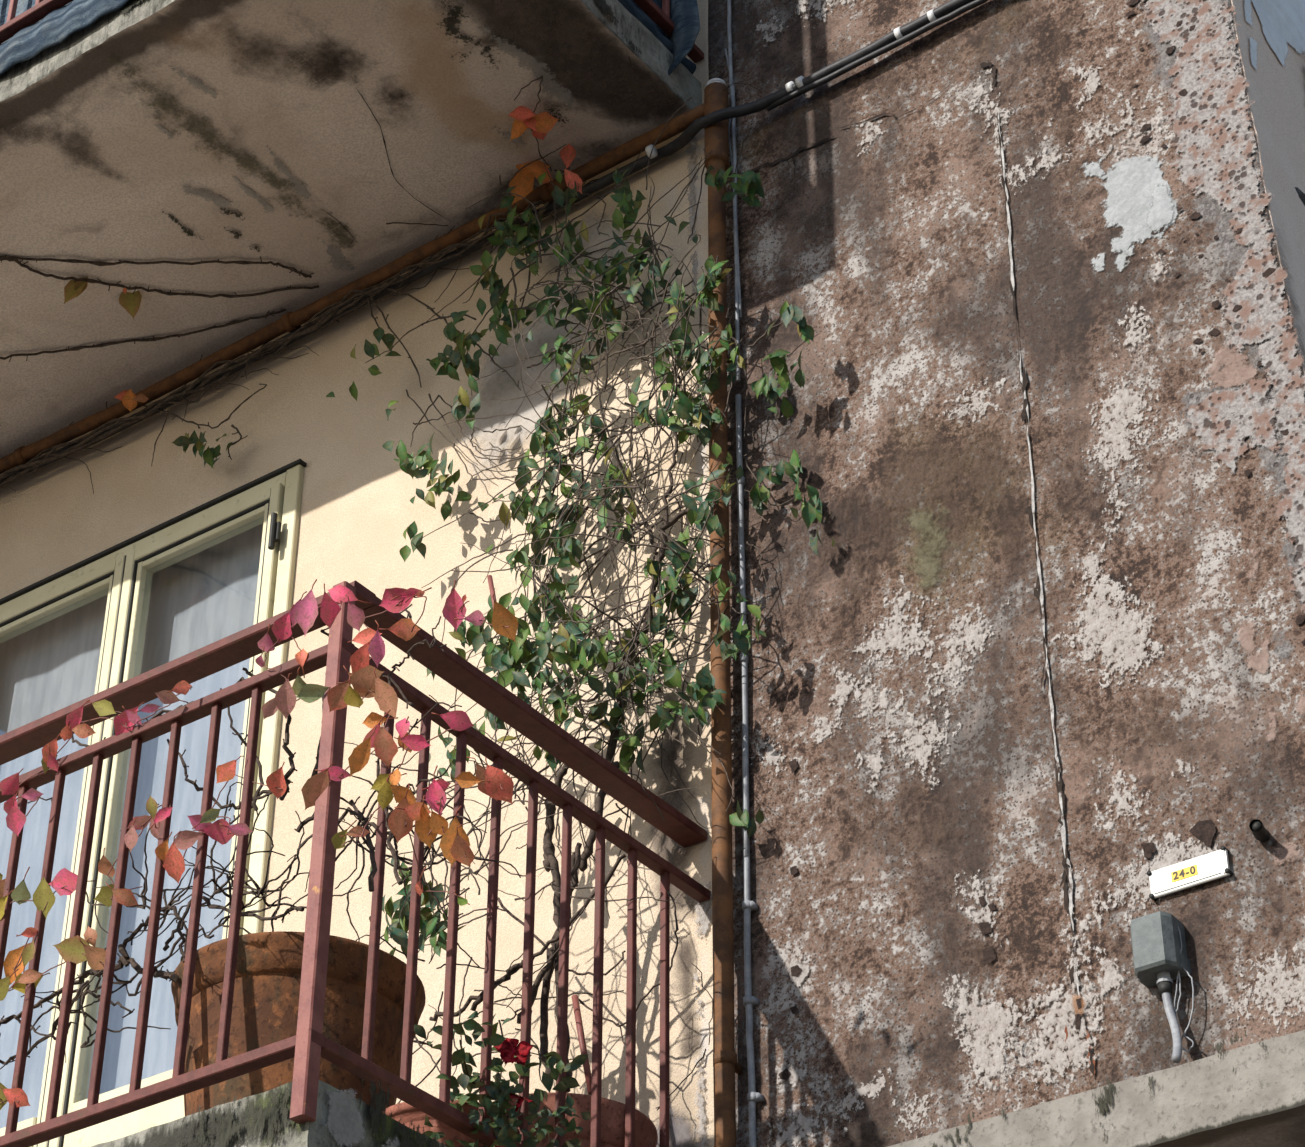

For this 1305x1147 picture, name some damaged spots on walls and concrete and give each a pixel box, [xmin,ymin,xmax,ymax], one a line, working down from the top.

crack [751,85,949,184]
peeling [856,118,885,156]
leakage [162,211,204,240]
leakage [183,176,275,253]
flaking render [963,0,1305,690]
crack [977,62,1095,1077]
peeling [1265,706,1277,741]
peeling [1274,842,1305,871]
peeling [1232,943,1305,1037]
leakage [177,1081,292,1147]
leakage [932,1111,974,1147]
leakage [1091,1078,1120,1141]